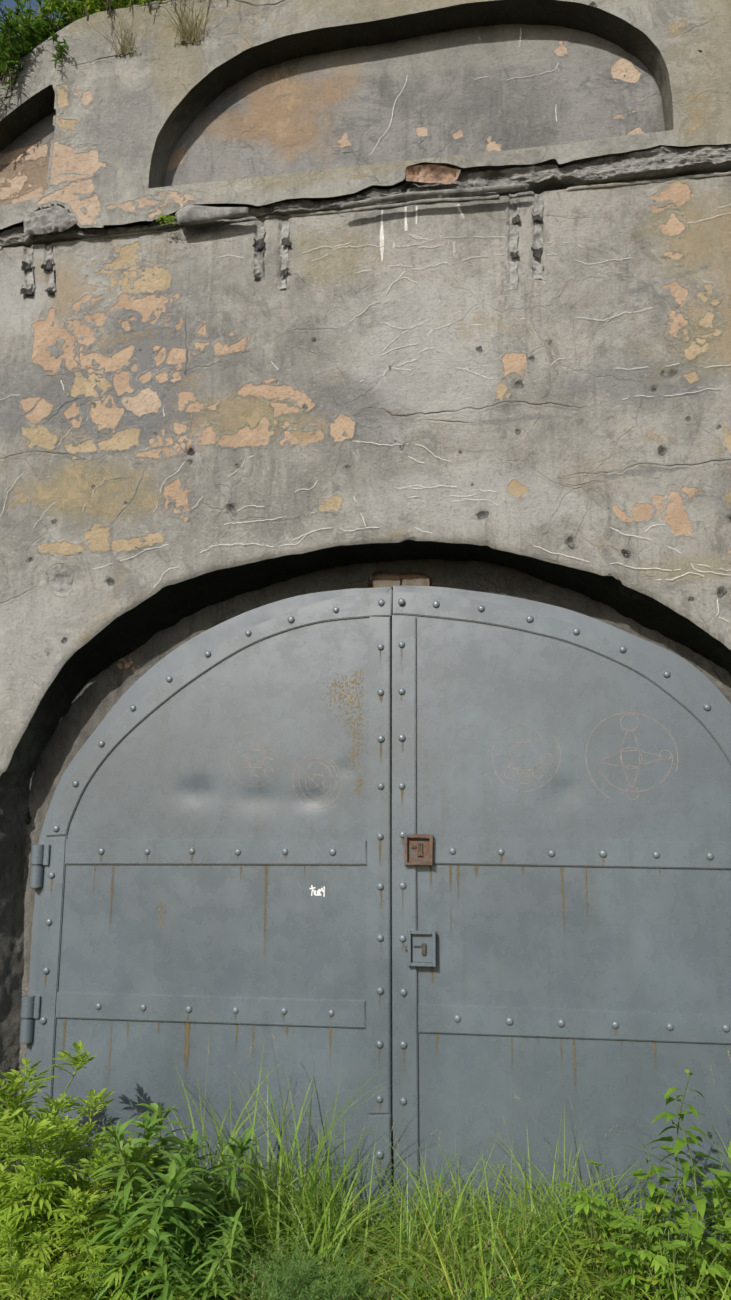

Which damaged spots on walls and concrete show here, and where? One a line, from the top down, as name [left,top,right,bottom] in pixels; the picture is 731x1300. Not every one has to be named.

crack [125,0,293,10]
peeling [608,54,647,90]
peeling [0,82,358,566]
spalling [222,144,731,402]
crack [270,234,731,534]
crack [0,380,255,528]
crack [92,480,380,588]
spalling [620,548,634,561]
crack [533,524,731,624]
peeling [607,476,707,539]
spalling [656,442,670,458]
corrosion [316,671,364,805]